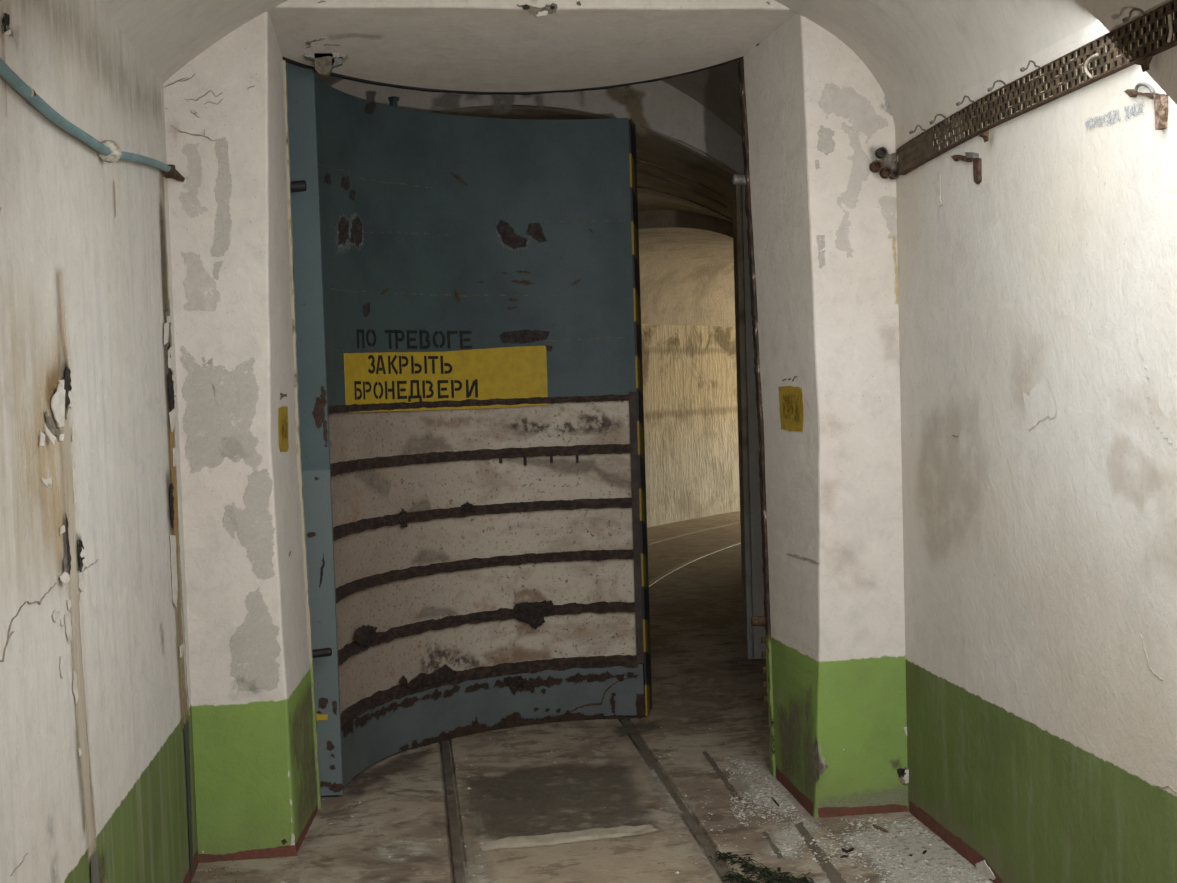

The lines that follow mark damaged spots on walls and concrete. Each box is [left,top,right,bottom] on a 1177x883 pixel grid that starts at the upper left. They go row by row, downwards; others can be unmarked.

peeling [816,235,825,268]
flaking render [39,364,86,641]
crack [0,559,99,662]
corrosion [317,671,646,793]